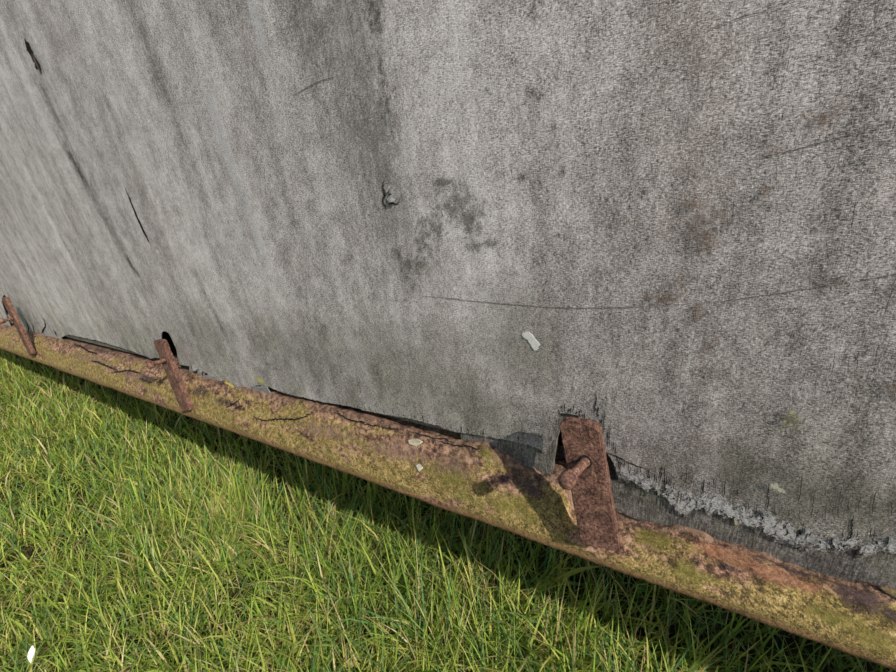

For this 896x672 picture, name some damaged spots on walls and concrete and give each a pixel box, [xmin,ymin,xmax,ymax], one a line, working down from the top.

corrosion [187,386,237,410]
corrosion [495,468,544,500]
crack [551,394,893,551]
damp [620,468,829,549]
peeling [619,471,896,555]
corrosion [691,537,896,623]
damp [840,541,896,553]